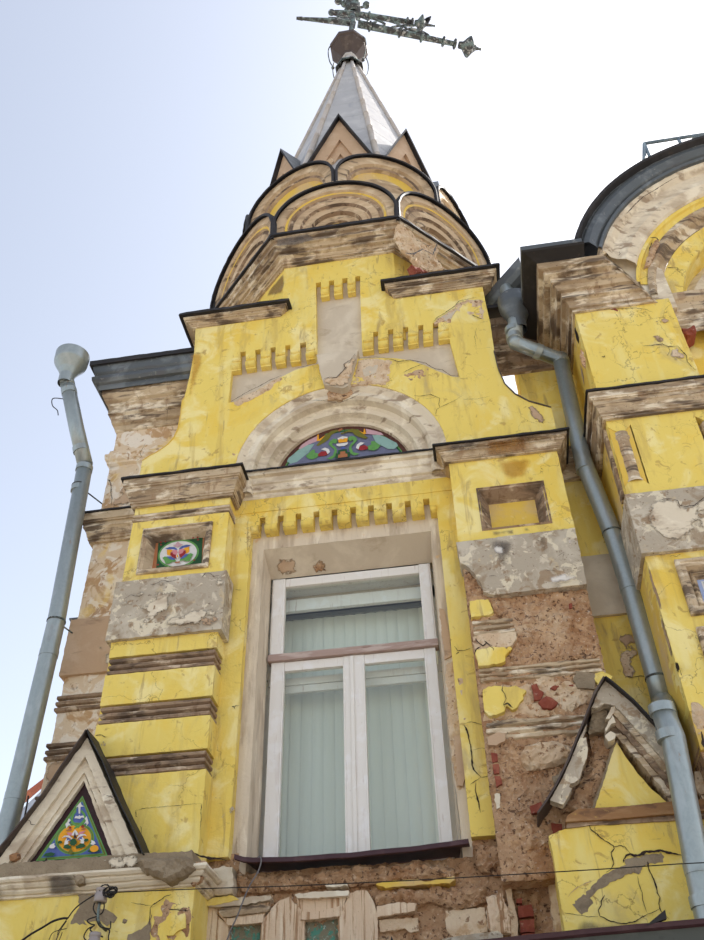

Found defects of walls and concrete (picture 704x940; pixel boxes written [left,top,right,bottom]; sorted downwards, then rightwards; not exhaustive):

spalling [394,224,444,275]
spalling [434,299,484,327]
spalling [325,355,392,402]
peeling [528,406,544,423]
peeling [649,500,704,540]
peeling [121,582,218,630]
spalling [464,569,612,721]
peeling [46,762,62,786]
crack [464,722,488,809]
spalling [487,732,576,852]
crack [567,825,682,924]
spalling [151,899,194,940]